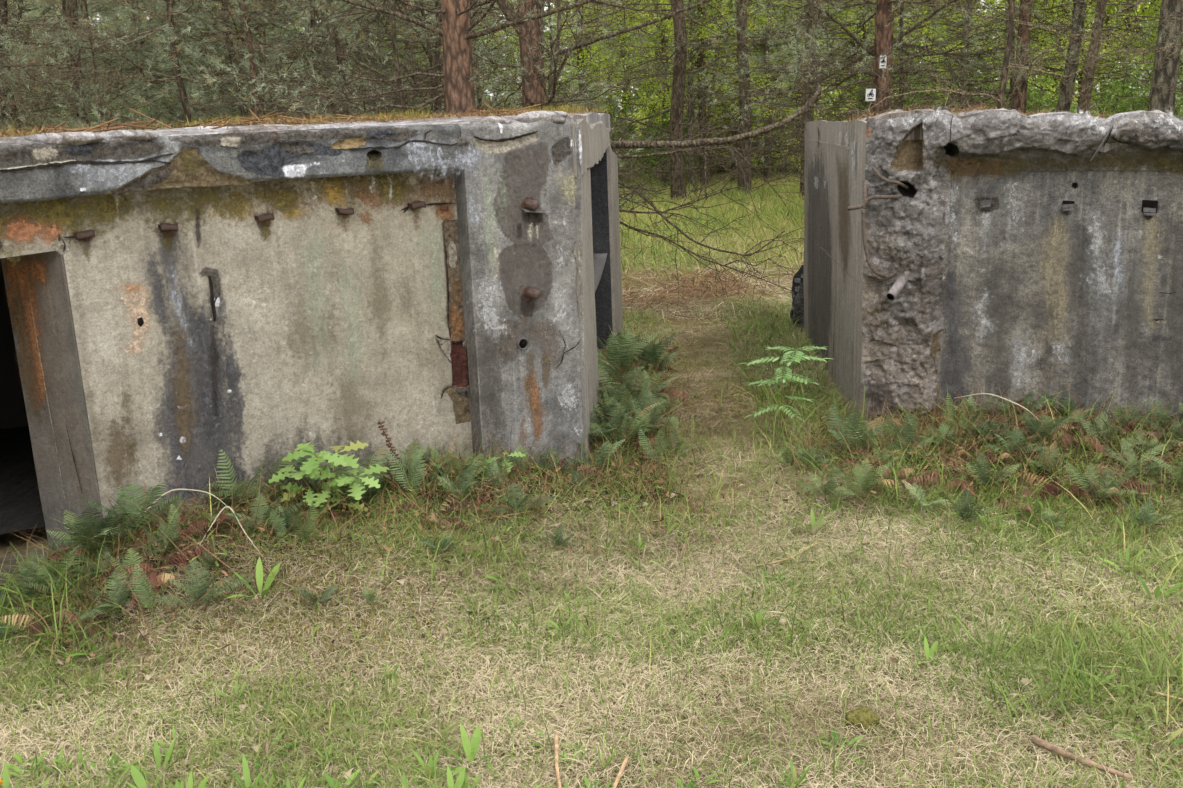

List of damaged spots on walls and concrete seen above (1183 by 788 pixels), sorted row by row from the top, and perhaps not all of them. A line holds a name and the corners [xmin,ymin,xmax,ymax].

rust [436,200,454,223]
spalling [847,123,923,278]
damp [933,150,1183,415]
damp [147,230,374,510]
rust [521,351,549,445]